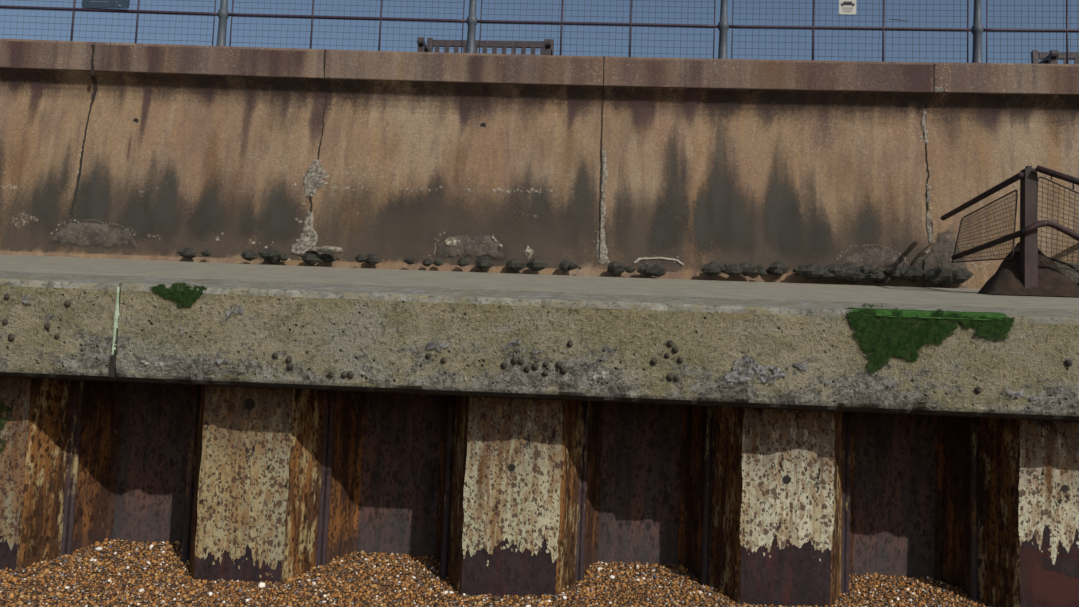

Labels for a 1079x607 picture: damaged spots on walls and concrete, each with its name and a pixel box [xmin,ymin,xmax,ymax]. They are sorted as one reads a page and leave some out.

crack [67,45,98,217]
crack [317,49,327,162]
spalling [287,159,368,261]
water stain [0,128,926,276]
crack [911,64,936,267]
peeling [195,386,293,578]
peeling [462,397,563,566]
peeling [740,408,835,561]
peeling [1018,420,1079,565]